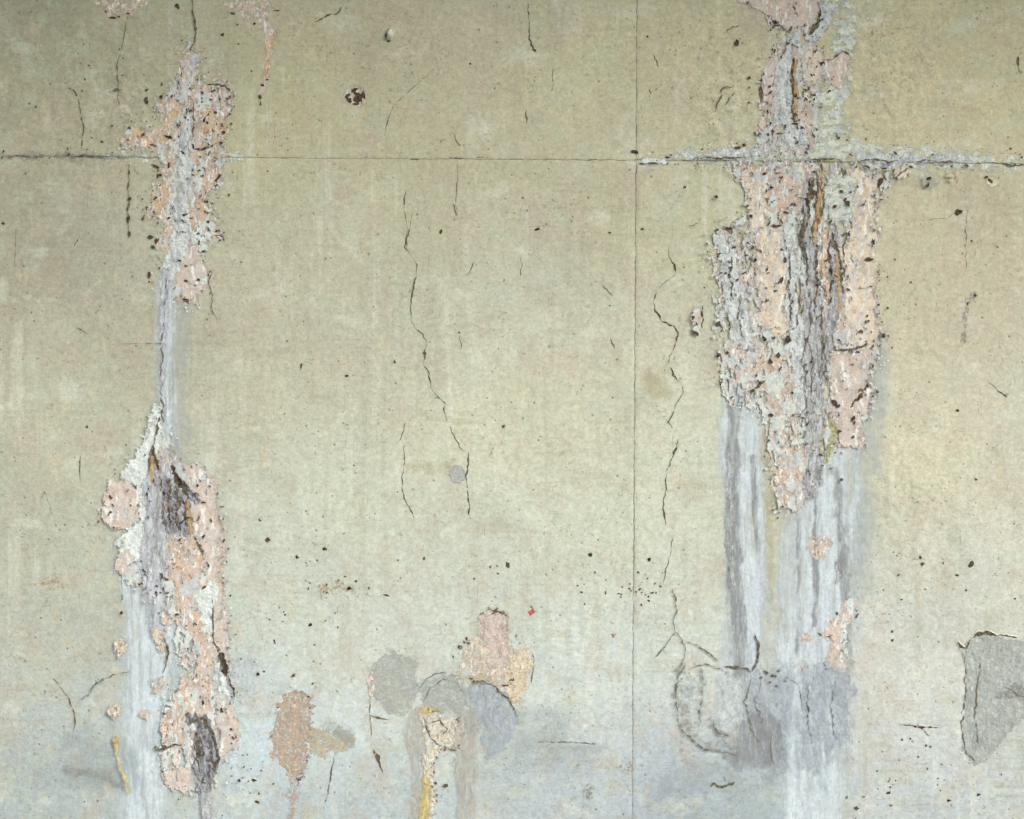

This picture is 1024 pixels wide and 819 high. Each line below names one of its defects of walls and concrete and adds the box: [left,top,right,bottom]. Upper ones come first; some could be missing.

leakage [63,563,179,819]
leakage [144,268,176,461]
spalling [111,37,237,316]
spalling [98,408,257,819]
spalling [269,674,356,819]
crack [399,424,413,514]
crack [403,191,470,515]
spalling [418,607,536,819]
crack [654,249,717,666]
leakage [719,385,862,819]
spalling [690,0,911,519]
spalling [800,597,859,682]